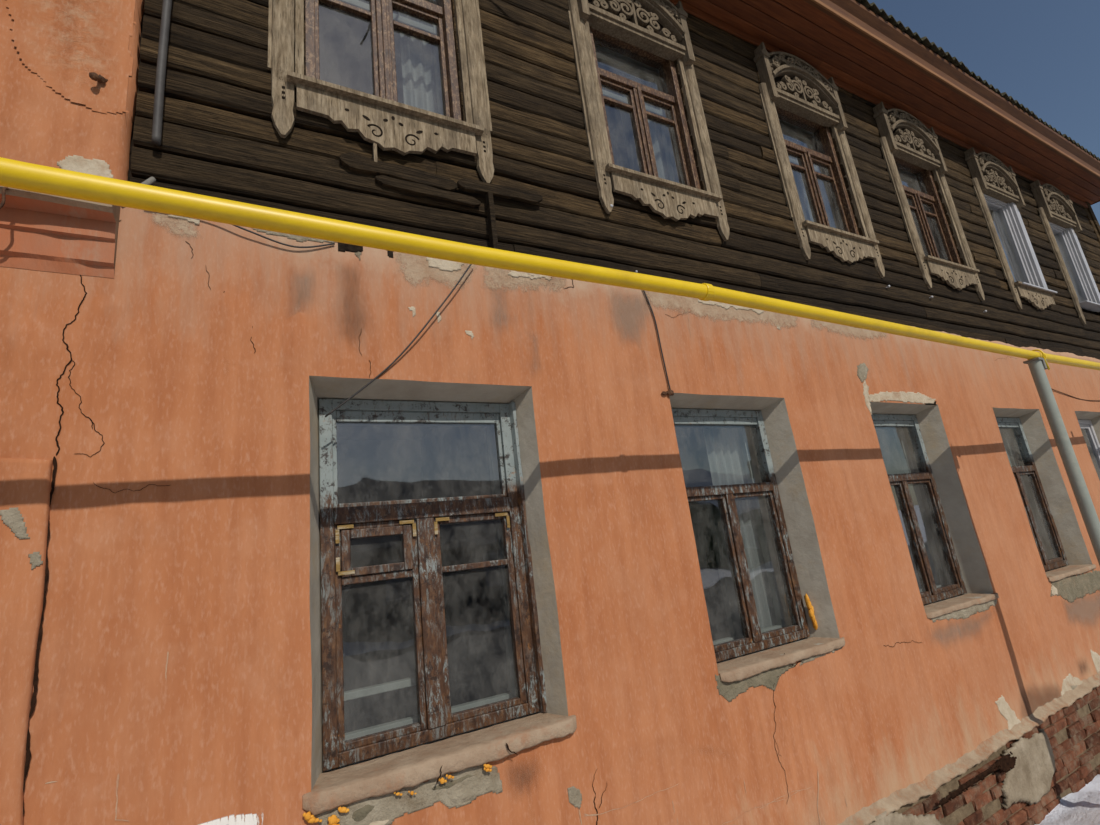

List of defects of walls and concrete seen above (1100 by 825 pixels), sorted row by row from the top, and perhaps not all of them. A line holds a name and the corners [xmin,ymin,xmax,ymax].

flaking render [386,250,566,291]
flaking render [647,291,797,330]
flaking render [811,319,886,340]
spalling [857,363,936,415]
spalling [0,507,30,539]
spalling [28,552,43,570]
crack [23,275,104,815]
spalling [1050,570,1100,603]
spalling [715,647,842,702]
flaking render [902,649,1100,825]
spalling [314,765,503,825]
crack [592,770,607,825]